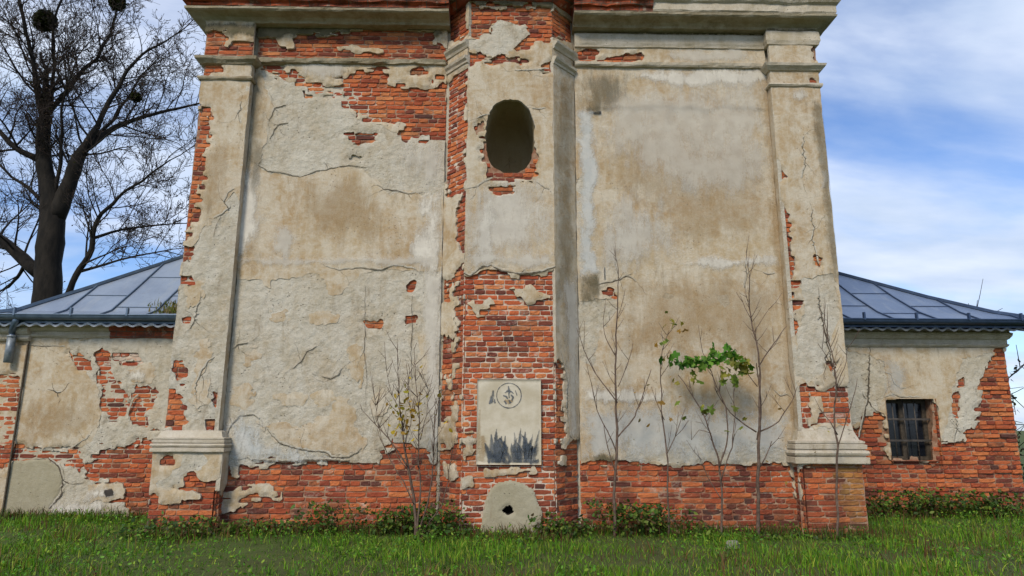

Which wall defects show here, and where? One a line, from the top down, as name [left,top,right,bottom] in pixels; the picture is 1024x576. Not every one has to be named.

crack [254,95,415,197]
flaking render [203,3,571,253]
crack [227,413,366,471]
crack [280,258,424,414]
flaking render [0,105,1024,534]
crack [801,132,921,437]